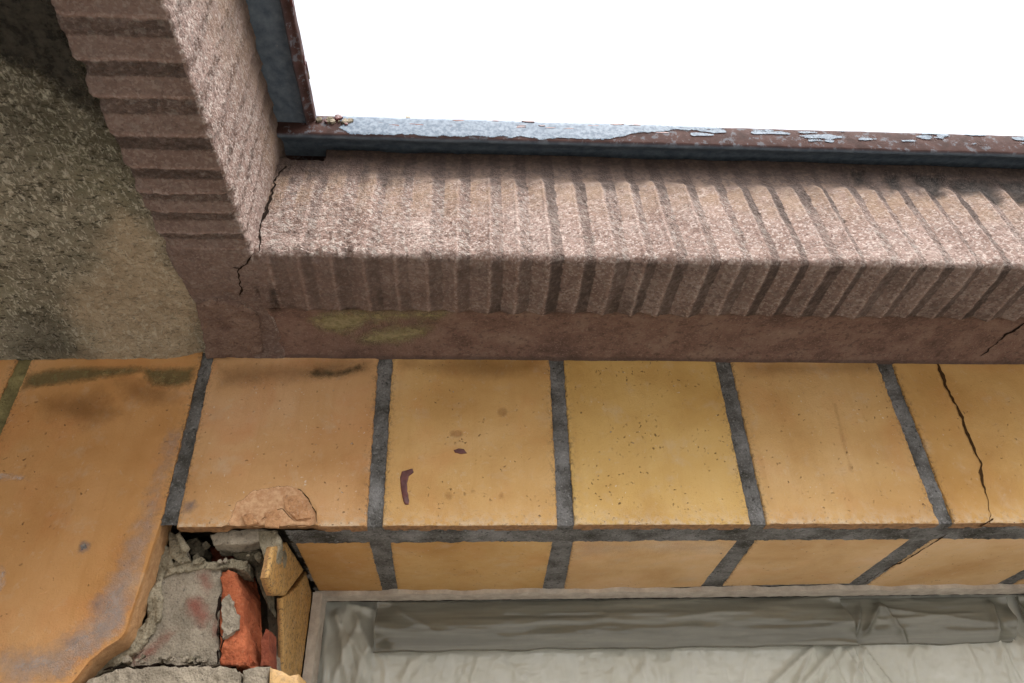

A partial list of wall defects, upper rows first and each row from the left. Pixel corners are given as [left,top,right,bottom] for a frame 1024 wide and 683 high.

crack [233,166,287,295]
damp [25,369,191,386]
crack [981,323,1024,356]
crack [937,364,993,527]
spalling [86,486,317,683]